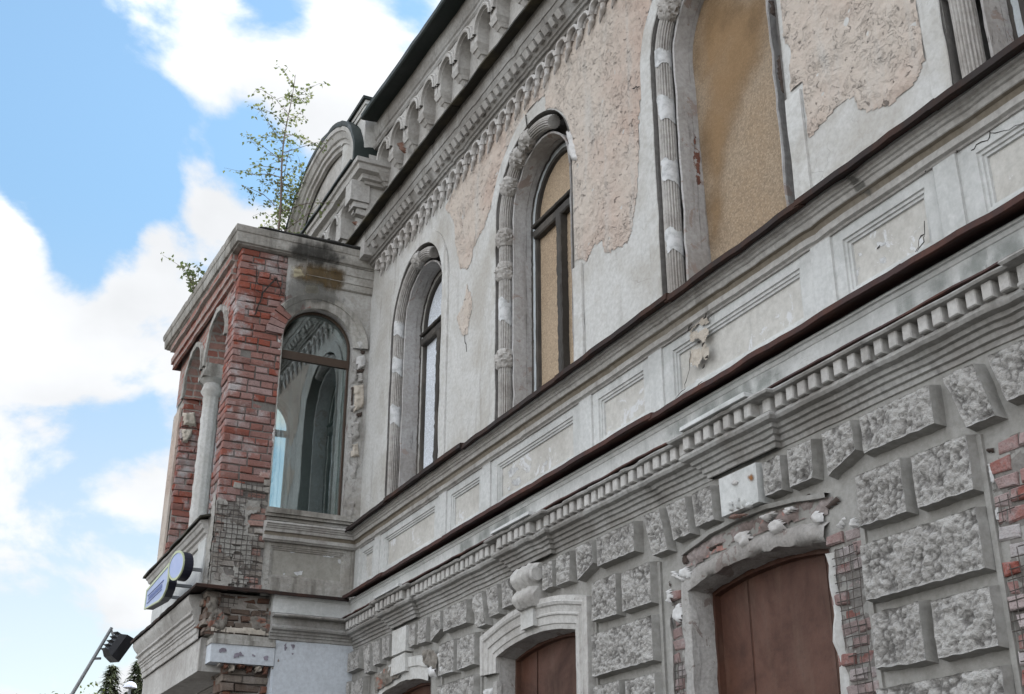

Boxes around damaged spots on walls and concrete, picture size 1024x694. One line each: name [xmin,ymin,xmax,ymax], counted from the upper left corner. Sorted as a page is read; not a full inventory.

spalling [768,0,925,138]
spalling [445,0,652,269]
crack [956,123,1024,153]
crack [915,221,925,252]
leakage [282,243,344,312]
spalling [688,313,709,368]
spalling [194,494,271,638]